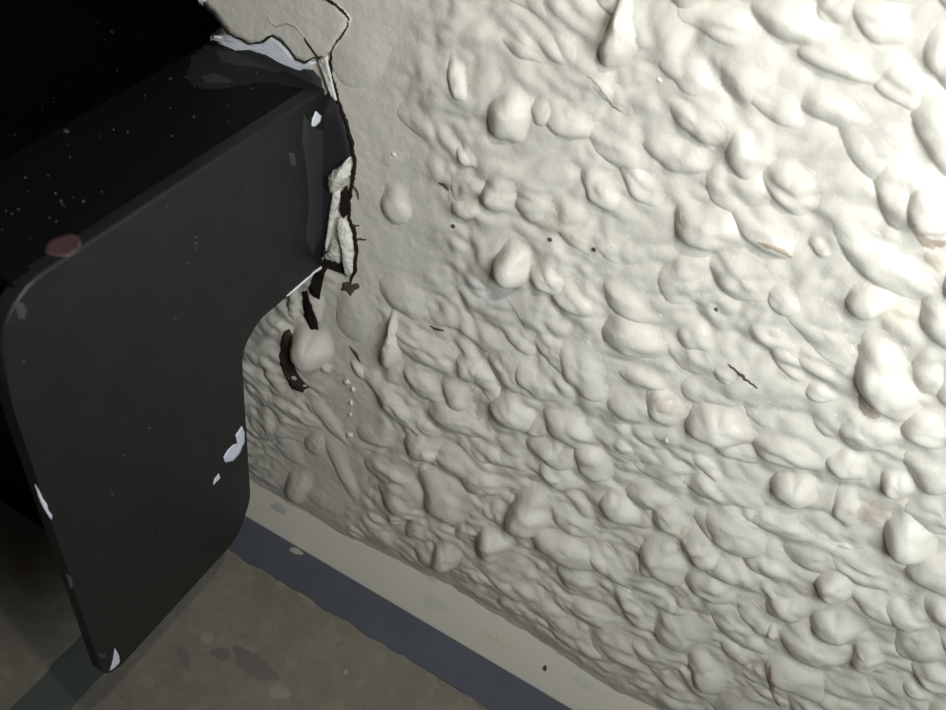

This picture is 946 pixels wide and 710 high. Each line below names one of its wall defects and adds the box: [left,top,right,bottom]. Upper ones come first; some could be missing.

peeling [197,0,360,330]
crack [203,0,367,284]